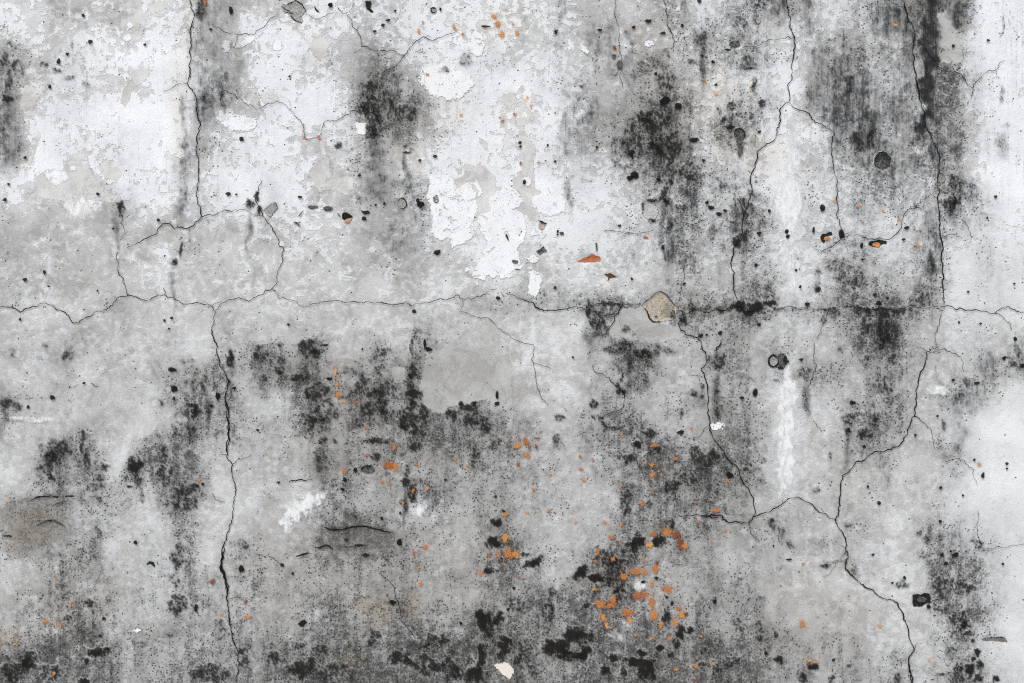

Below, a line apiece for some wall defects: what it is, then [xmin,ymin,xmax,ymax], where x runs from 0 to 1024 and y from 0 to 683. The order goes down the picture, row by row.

peeling [418,61,476,101]
damp [801,0,966,176]
peeling [294,130,566,298]
crack [0,0,637,682]
damp [253,335,429,462]
rust [513,438,540,466]
peeling [605,291,684,345]
damp [676,137,937,447]
crack [674,0,1023,683]
damp [387,597,597,683]
rust [487,534,519,565]
rust [593,526,688,640]